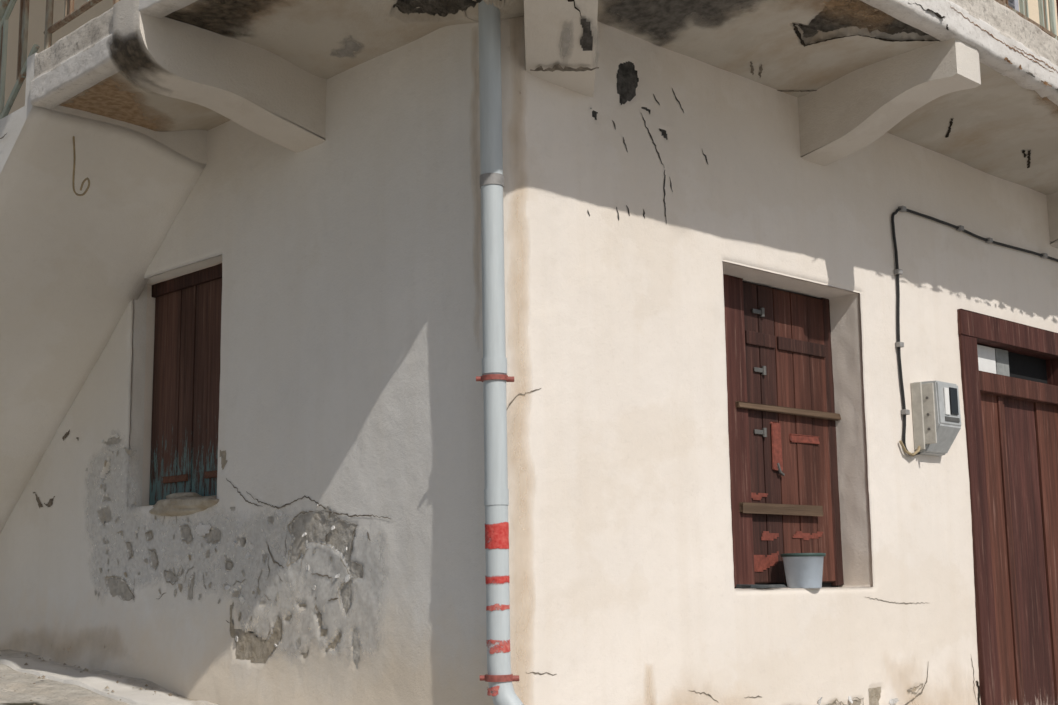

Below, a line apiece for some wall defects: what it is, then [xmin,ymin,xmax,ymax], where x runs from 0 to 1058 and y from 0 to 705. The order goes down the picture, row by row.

spalling [393,0,482,17]
damp [606,0,754,44]
spalling [798,0,929,38]
crack [530,64,599,72]
peeling [616,61,651,114]
flaking render [94,433,363,669]
crack [226,479,390,601]
flaking render [817,683,923,705]